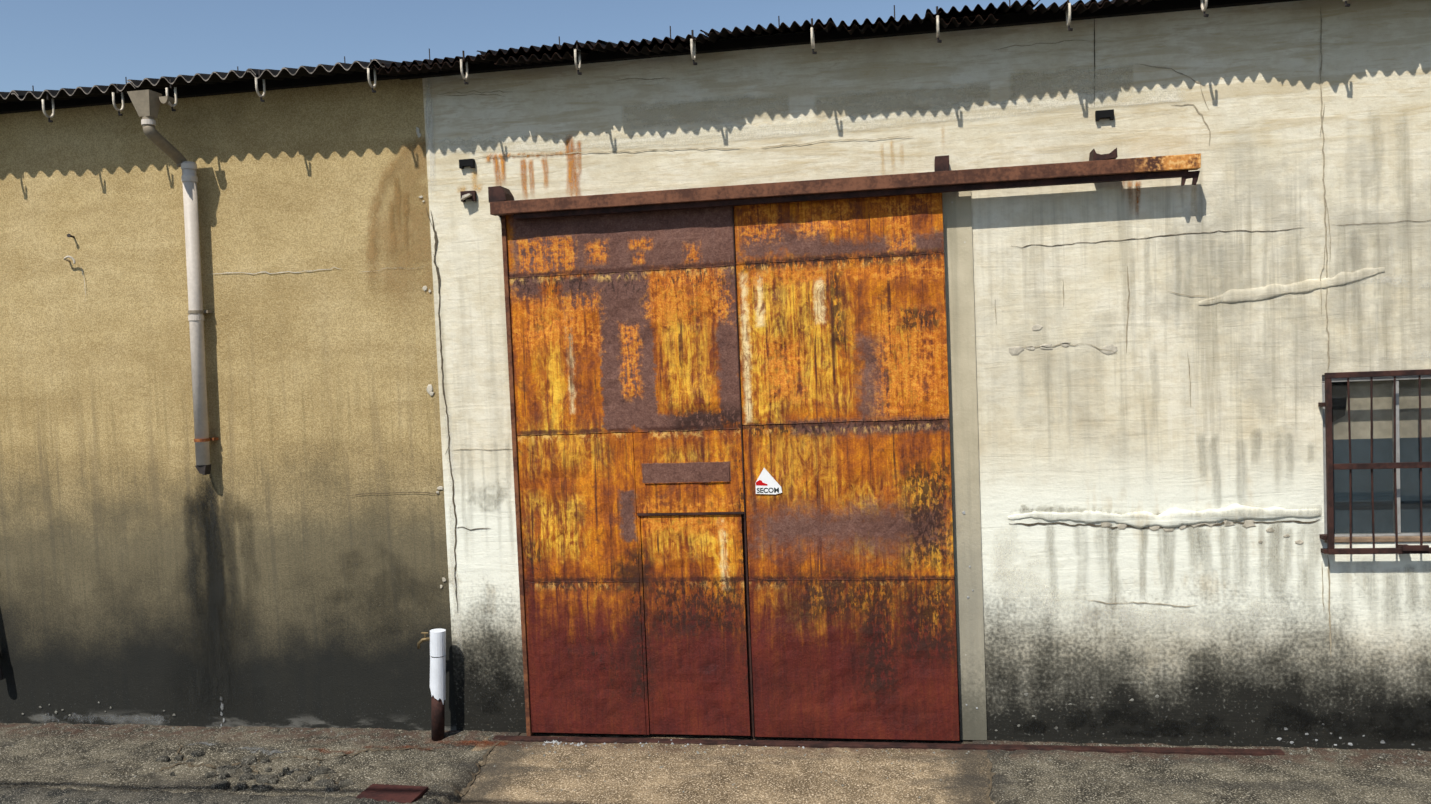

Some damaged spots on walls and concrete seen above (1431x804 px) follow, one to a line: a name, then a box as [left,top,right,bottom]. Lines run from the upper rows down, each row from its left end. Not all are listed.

rust [487,139,581,196]